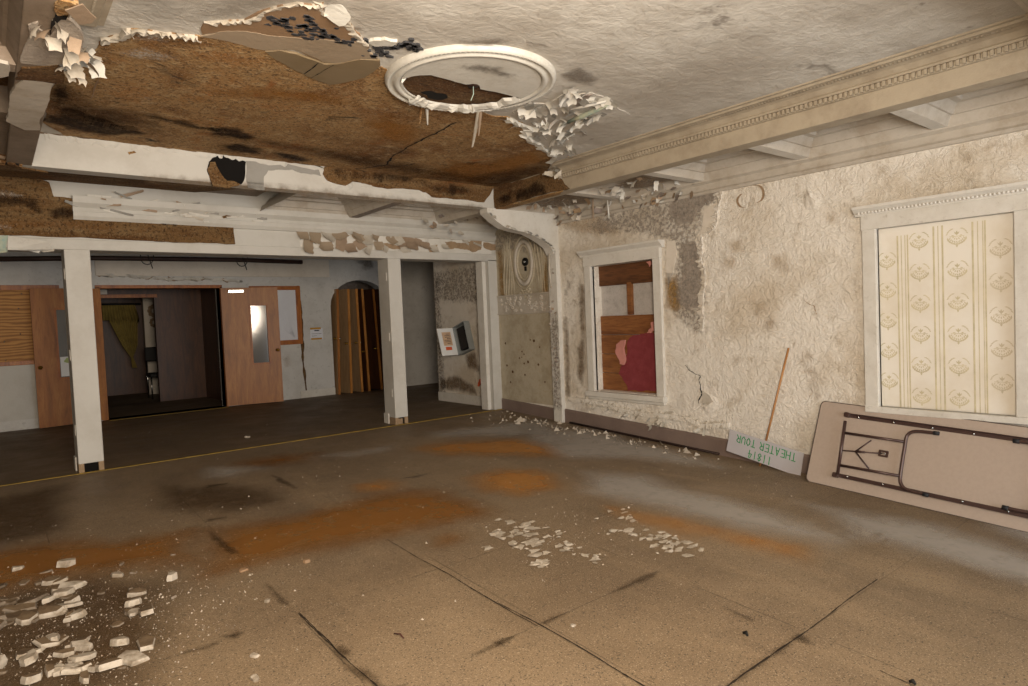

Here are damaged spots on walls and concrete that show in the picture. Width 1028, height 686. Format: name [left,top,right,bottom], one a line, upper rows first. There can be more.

spalling [0,0,730,436]
crack [355,122,457,172]